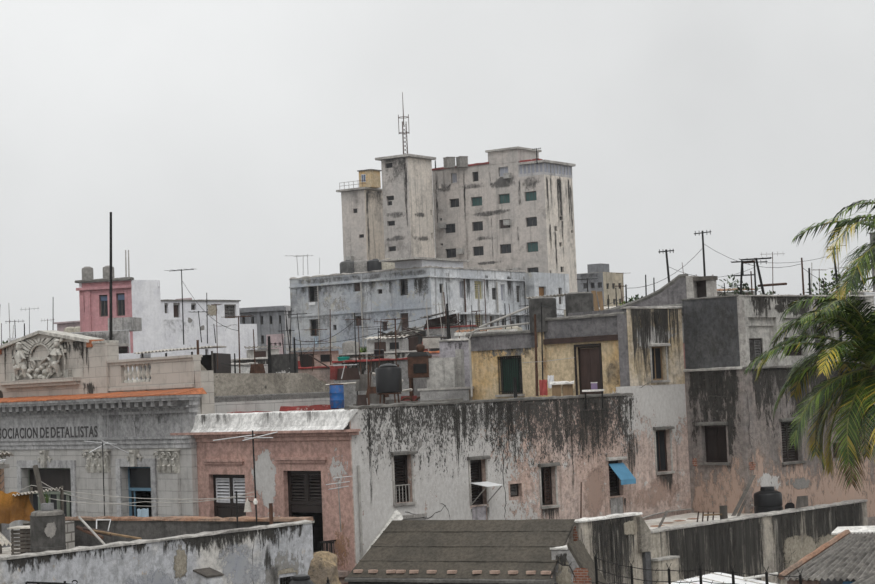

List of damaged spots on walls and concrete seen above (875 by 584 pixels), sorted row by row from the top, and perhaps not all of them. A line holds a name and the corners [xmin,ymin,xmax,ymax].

leakage [490,177,573,266]
leakage [355,388,638,484]
peeling [251,449,280,517]
leakage [657,474,673,490]
leakage [7,543,148,573]
peeling [127,544,188,584]
leakage [163,524,303,584]
leakage [588,498,636,584]
leakage [665,502,864,580]